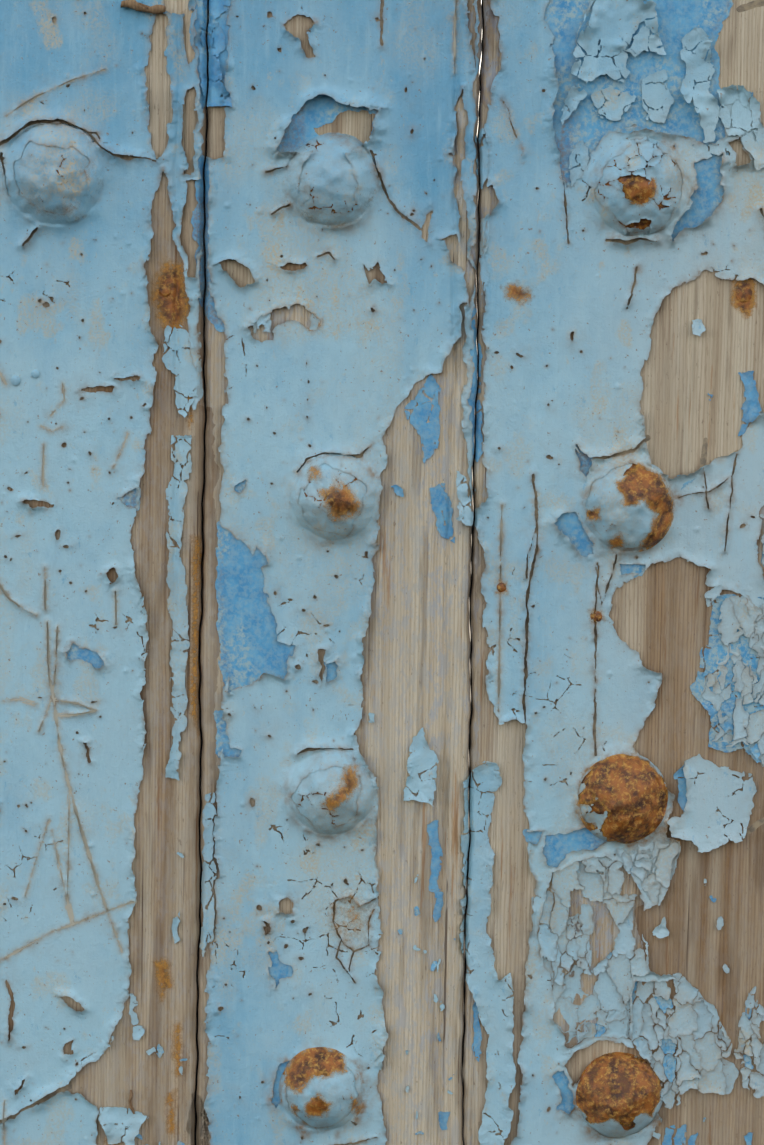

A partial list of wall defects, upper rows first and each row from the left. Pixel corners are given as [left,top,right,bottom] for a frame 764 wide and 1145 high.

peeling [284,14,316,58]
peeling [276,94,378,152]
corrosion [623,176,657,205]
peeling [280,263,307,271]
corrosion [310,467,360,521]
corrosion [616,463,674,552]
peeling [61,0,296,1145]
peeling [354,0,764,1145]
peeling [318,649,338,682]
corrosion [578,754,668,844]
corrosion [284,1047,348,1116]
corrosion [576,1052,662,1125]